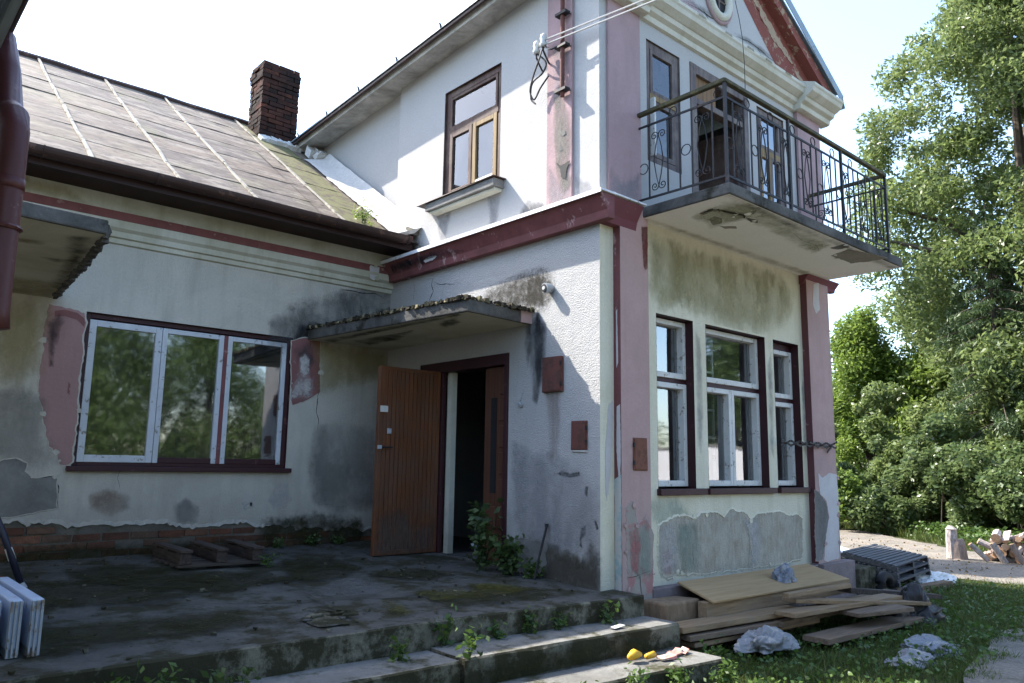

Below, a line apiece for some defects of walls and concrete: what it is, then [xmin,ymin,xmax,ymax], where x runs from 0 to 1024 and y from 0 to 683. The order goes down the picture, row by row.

peeling [700,208,758,229]
flaking render [0,224,372,563]
peeling [289,294,535,406]
water stain [507,277,543,334]
flaking render [605,400,841,599]